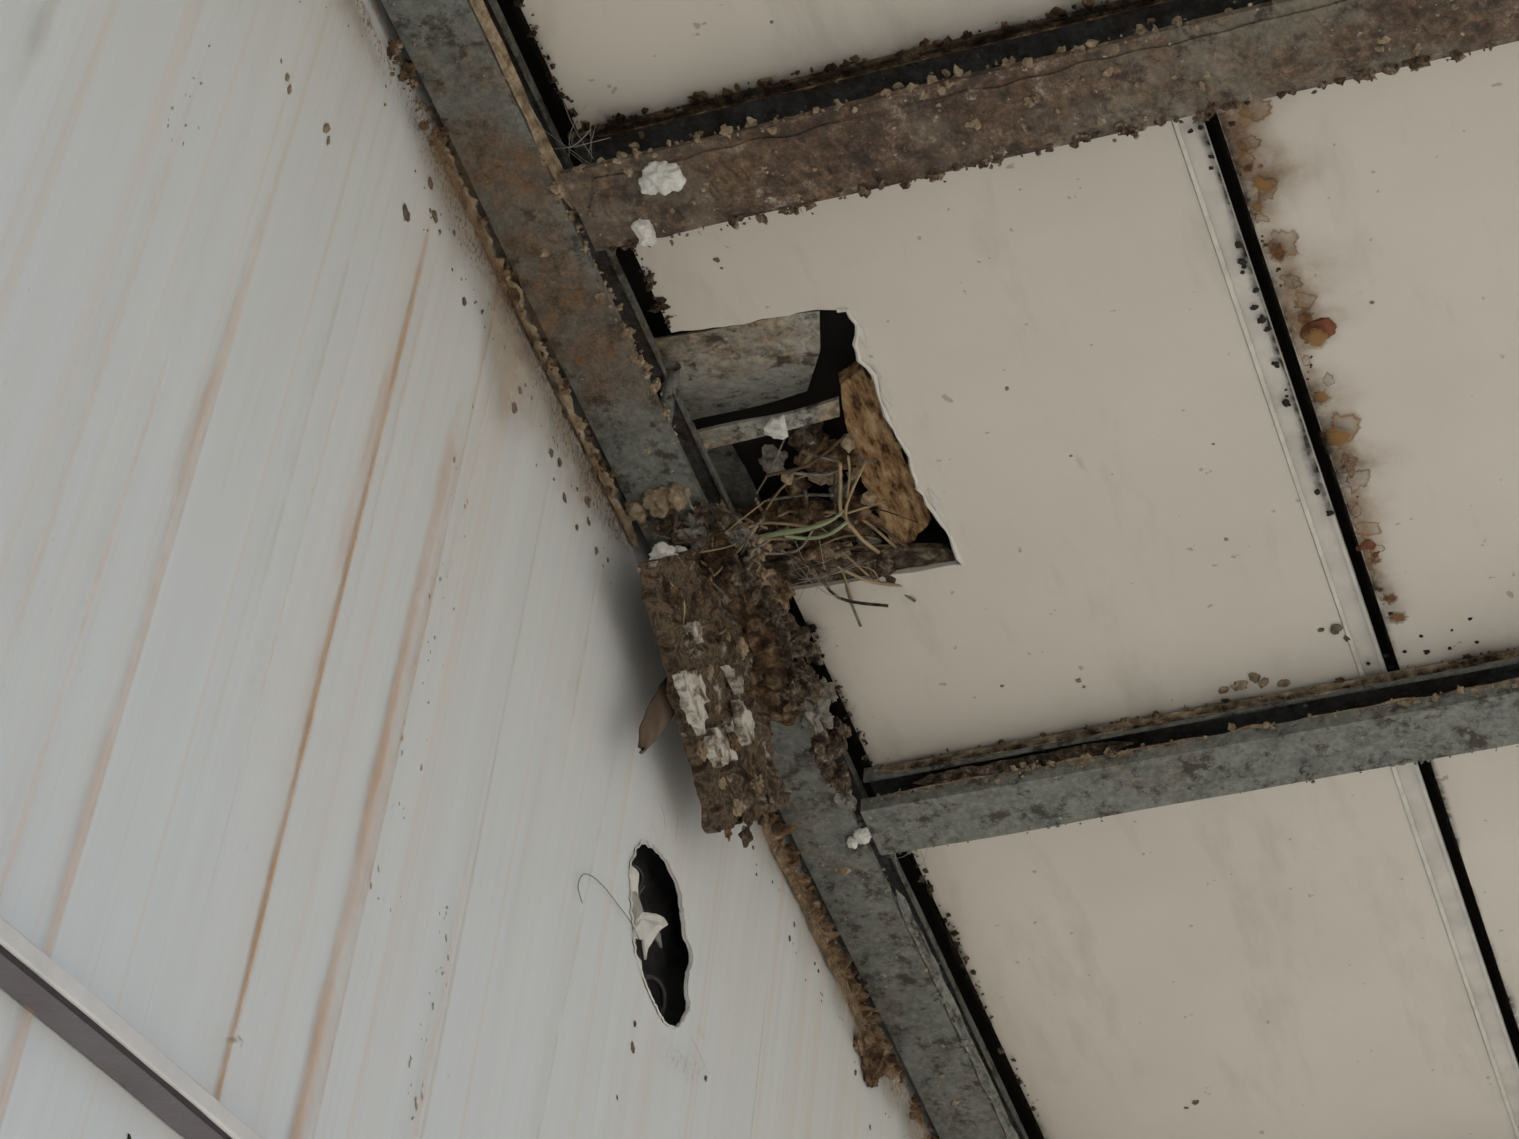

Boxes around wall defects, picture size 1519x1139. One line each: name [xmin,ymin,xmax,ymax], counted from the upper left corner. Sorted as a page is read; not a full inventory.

hole [761,308,965,603]